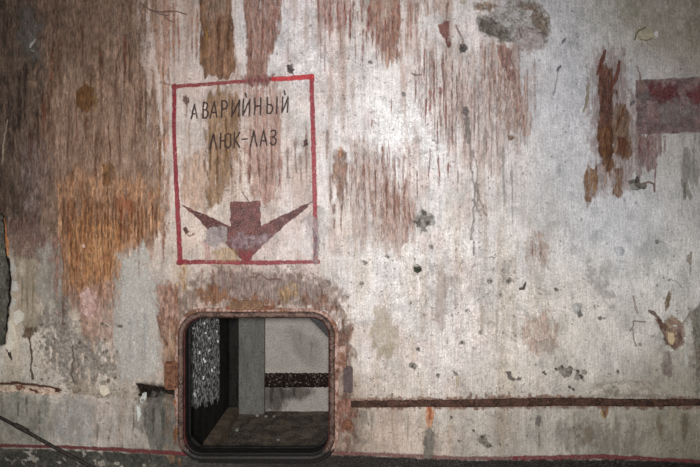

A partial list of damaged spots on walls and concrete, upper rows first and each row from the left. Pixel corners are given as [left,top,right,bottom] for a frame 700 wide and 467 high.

rust [0,0,180,348]
rust [191,0,307,207]
rust [326,131,418,260]
rust [311,0,536,175]
rust [583,47,666,202]
spalling [0,213,24,360]
peeling [0,240,174,422]
rust [156,248,357,366]
rust [336,372,615,453]
spalling [648,292,700,394]